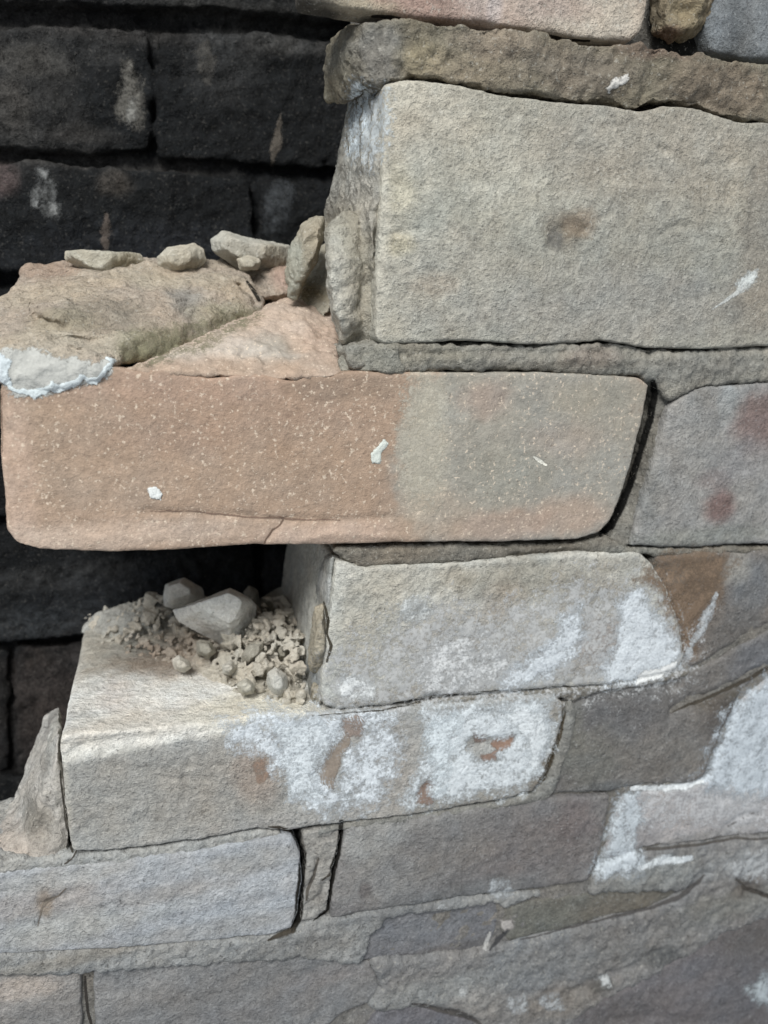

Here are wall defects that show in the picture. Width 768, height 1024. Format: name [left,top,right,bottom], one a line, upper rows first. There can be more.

spalling [0,216,341,400]
crack [598,380,658,537]
damp [216,557,718,821]
damp [590,674,768,883]
crack [267,820,343,941]